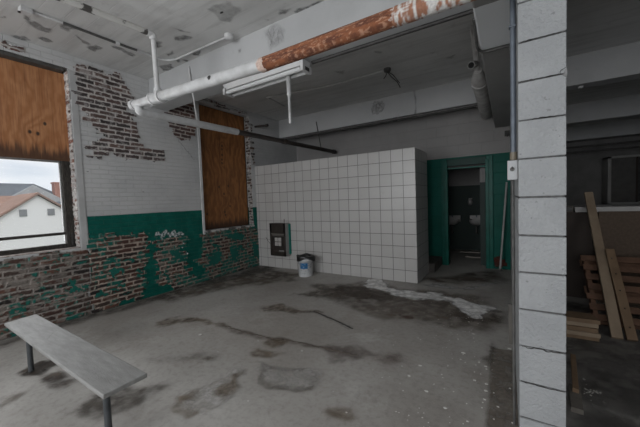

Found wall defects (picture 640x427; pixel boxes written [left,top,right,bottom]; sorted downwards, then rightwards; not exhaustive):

rust [262,8,396,71]
peeling [0,63,260,341]
leakage [299,272,500,329]